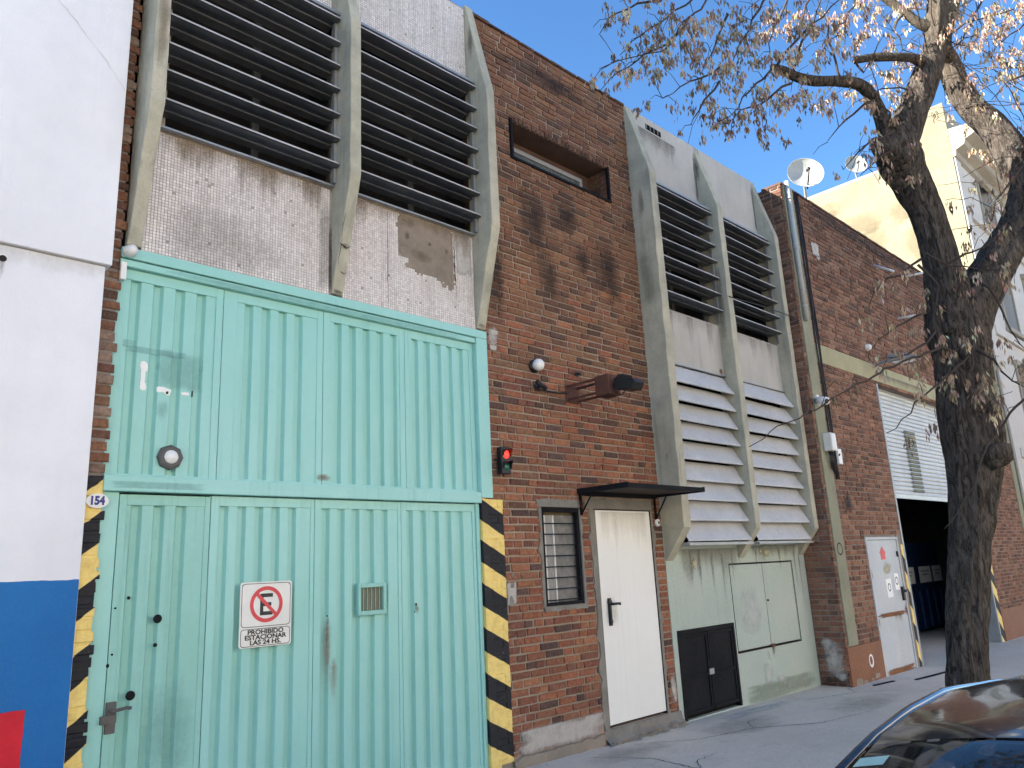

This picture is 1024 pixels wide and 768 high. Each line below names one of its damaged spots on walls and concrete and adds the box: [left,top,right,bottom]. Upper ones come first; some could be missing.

spalling [396,213,455,290]
water stain [822,639,846,681]